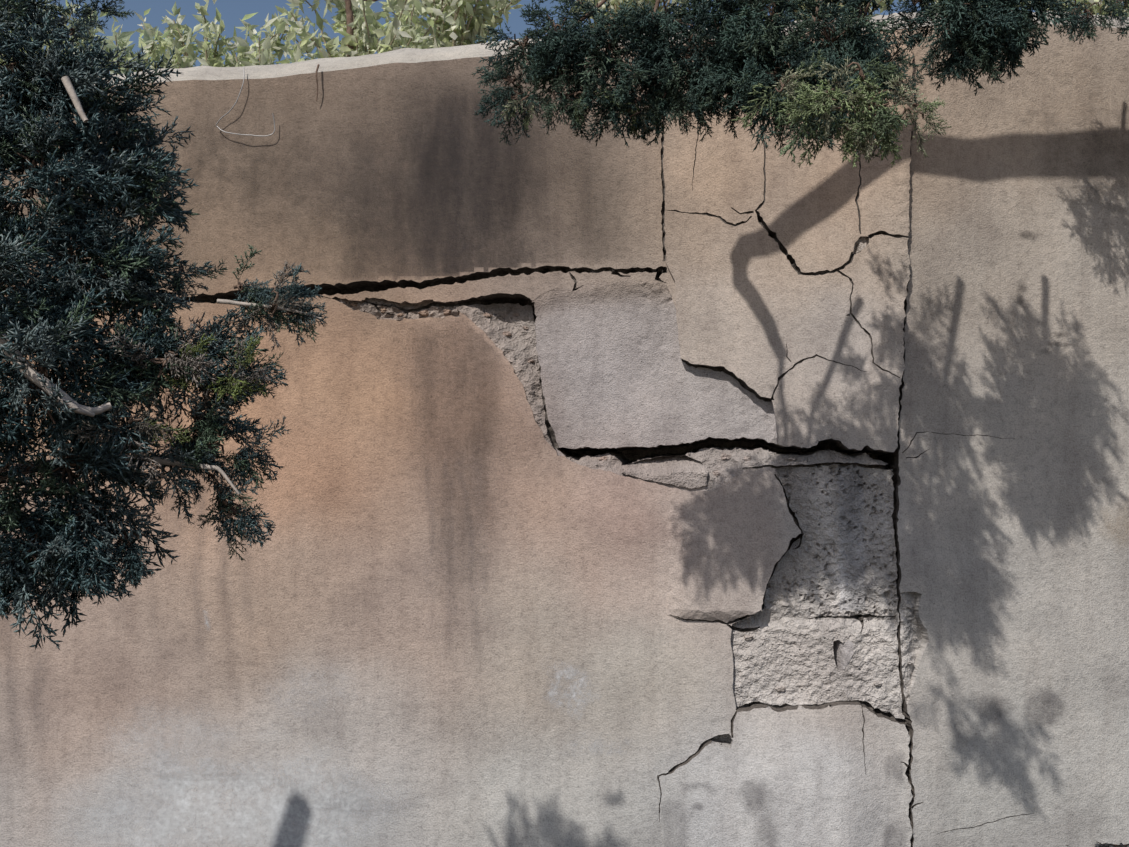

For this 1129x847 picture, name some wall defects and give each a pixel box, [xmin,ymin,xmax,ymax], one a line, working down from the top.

flaking render [325,279,778,461]
crack [147,90,1034,847]
flaking render [730,456,929,716]
leakage [229,796,293,844]